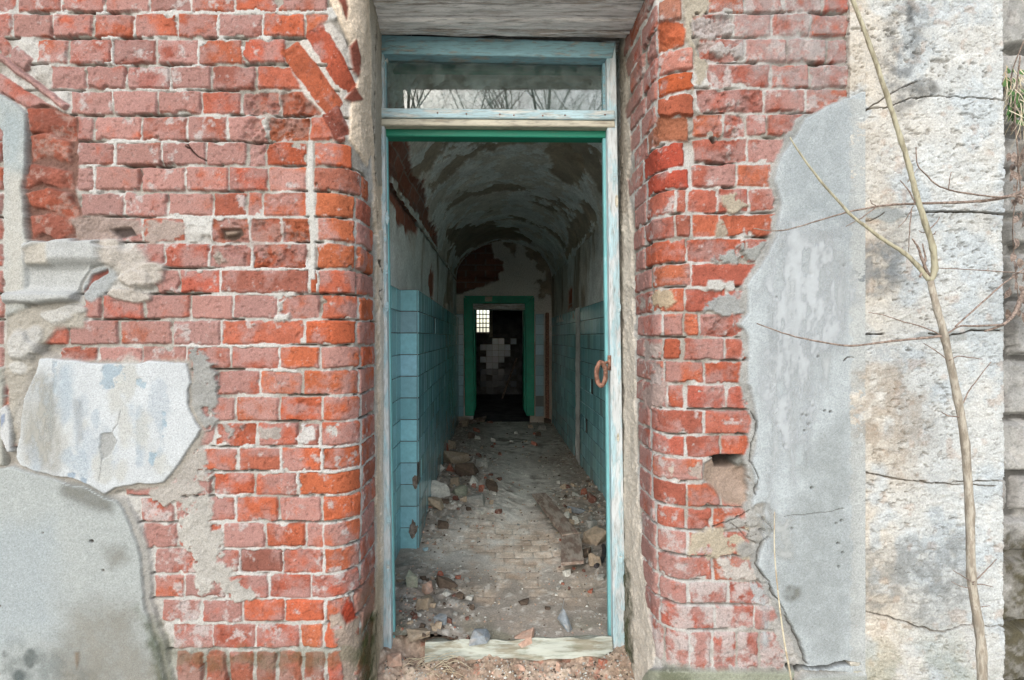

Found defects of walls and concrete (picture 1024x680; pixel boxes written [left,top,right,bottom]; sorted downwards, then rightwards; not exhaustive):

spalling [656,14,742,64]
crack [865,80,1002,111]
spalling [241,90,322,157]
spalling [653,89,763,164]
spalling [21,103,142,242]
spalling [209,218,311,268]
flaking render [384,141,552,314]
crack [925,208,1004,216]
flaking render [0,357,202,493]
spalling [702,454,747,507]
crack [866,471,1000,486]
crack [865,610,1003,634]